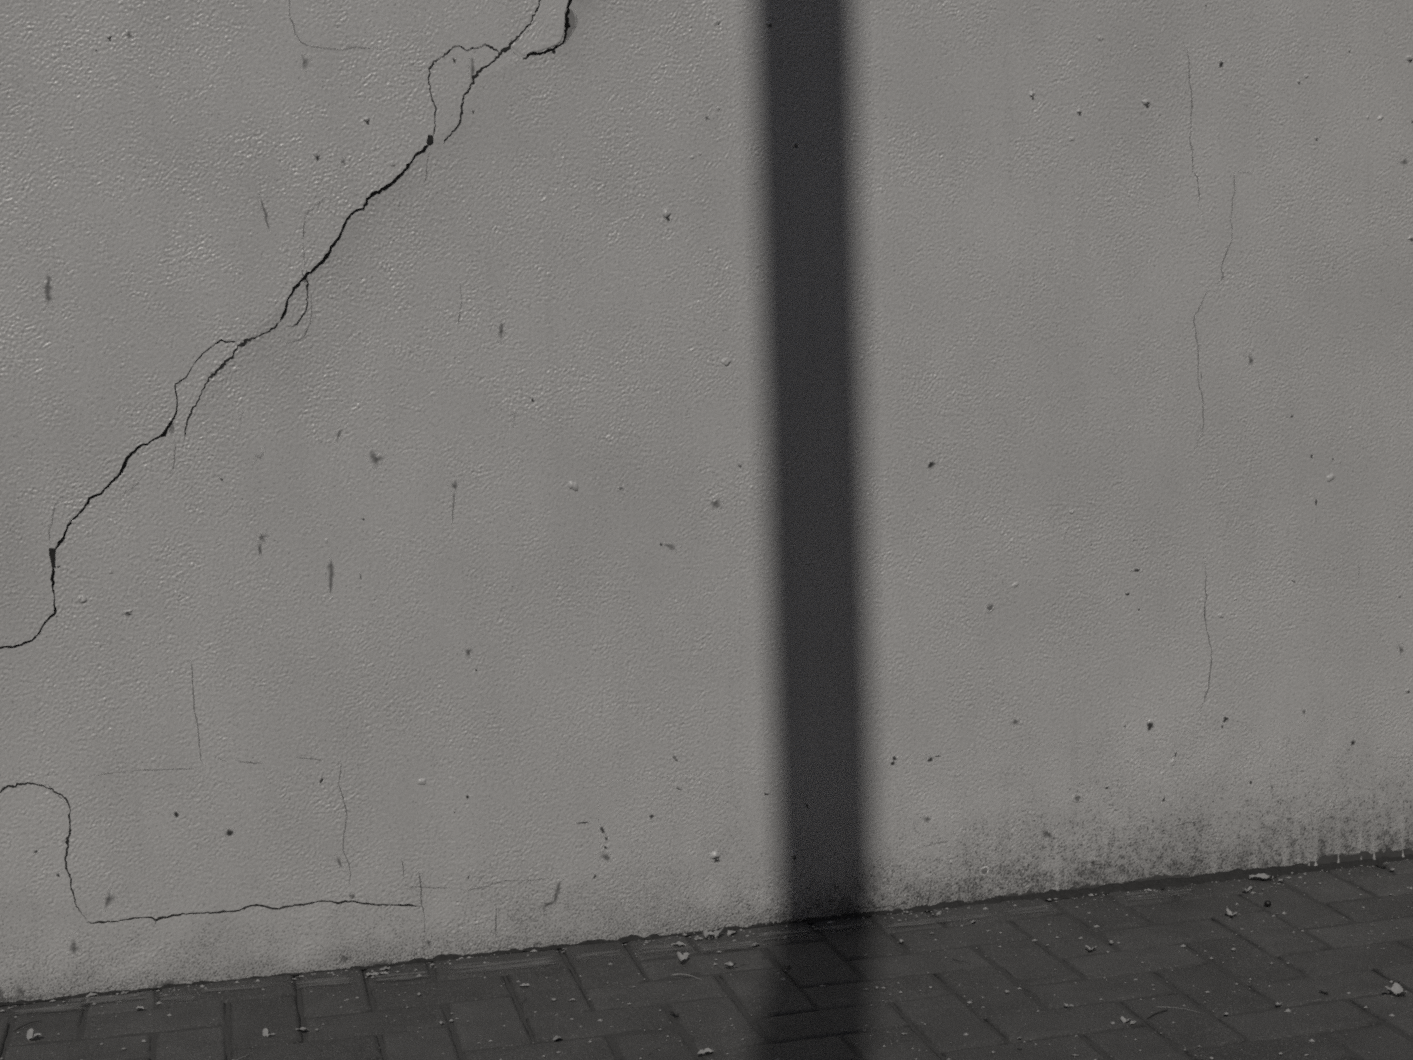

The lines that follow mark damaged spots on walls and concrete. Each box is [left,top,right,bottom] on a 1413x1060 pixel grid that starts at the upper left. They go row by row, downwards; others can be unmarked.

crack [0,0,575,648]
crack [0,782,415,923]